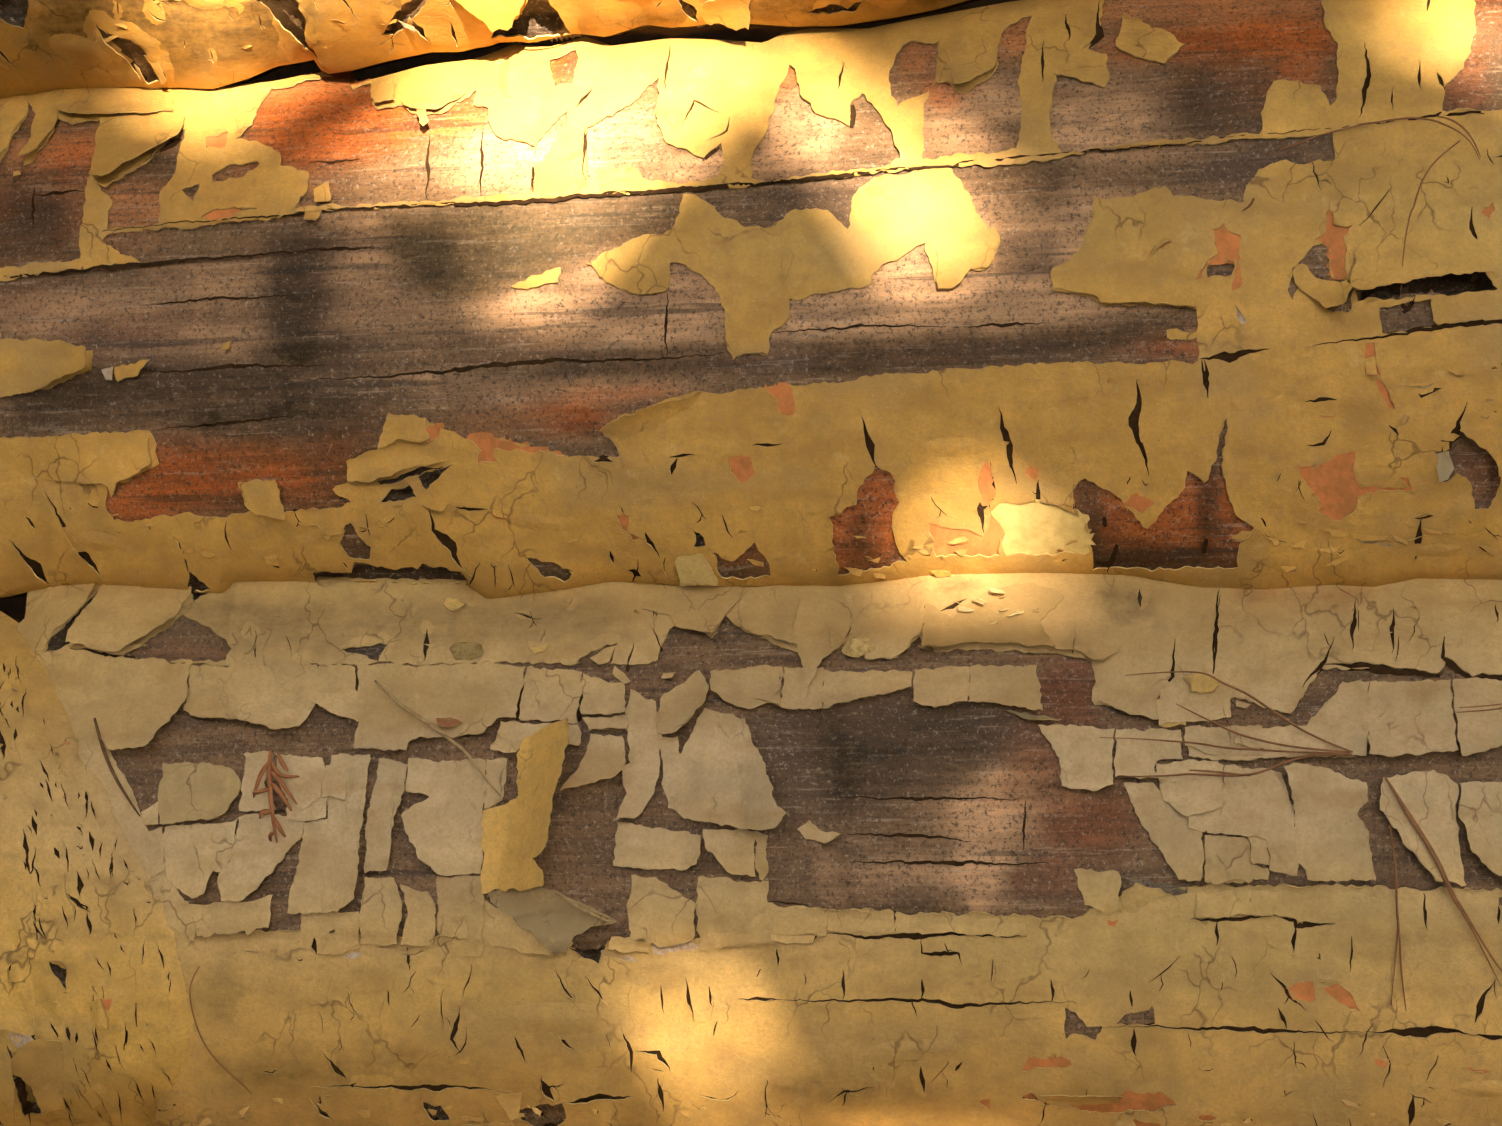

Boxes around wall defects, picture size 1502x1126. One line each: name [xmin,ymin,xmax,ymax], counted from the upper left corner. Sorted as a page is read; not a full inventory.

peeling [1442,0,1502,112]
crack [4,48,1484,283]
peeling [0,0,1339,533]
crack [1308,285,1502,347]
peeling [1435,398,1501,509]
peeling [17,419,1502,969]
crack [1303,601,1502,686]
crack [0,656,171,1126]
peeling [419,1093,574,1126]
crack [319,949,781,1126]
crack [661,901,1089,1105]
peeling [1064,1007,1155,1040]